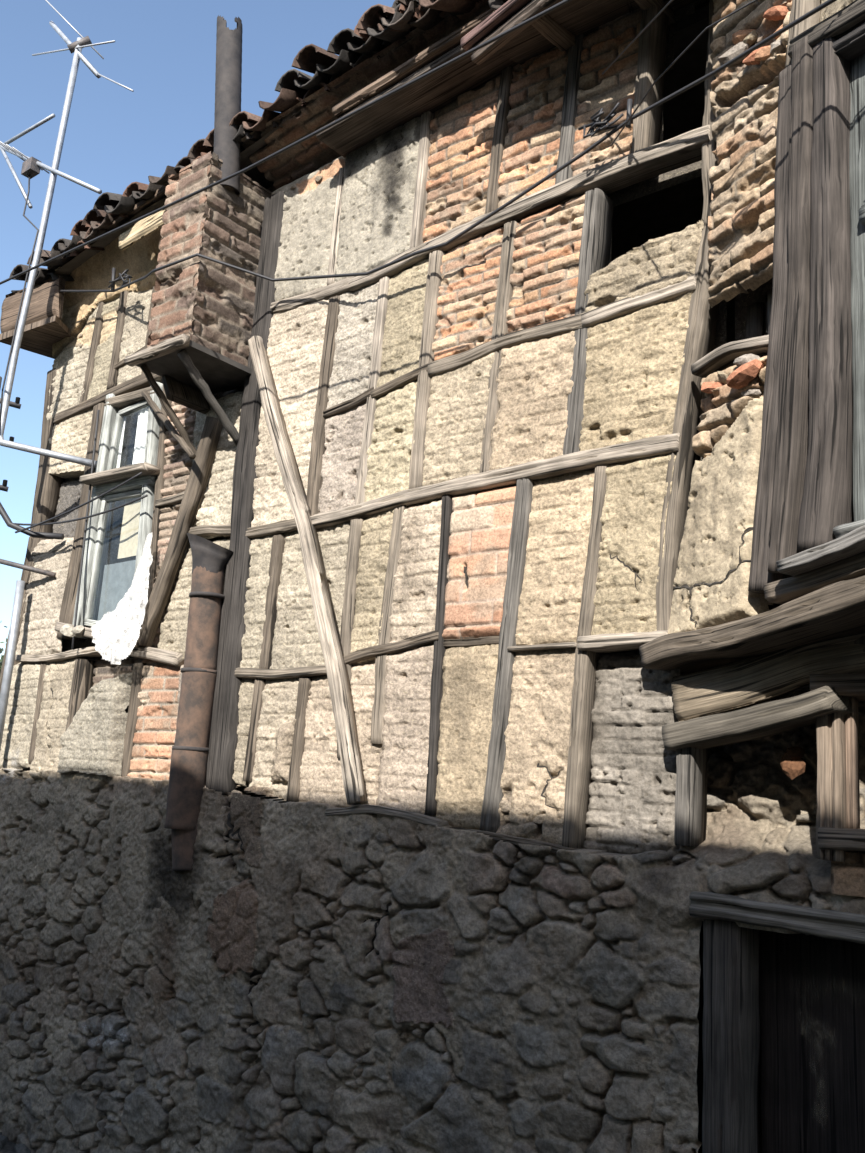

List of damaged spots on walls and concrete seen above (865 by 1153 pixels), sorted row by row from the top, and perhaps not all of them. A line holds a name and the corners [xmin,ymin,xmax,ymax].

spalling [718,1,791,72]
spalling [692,354,767,458]
crack [610,554,643,590]
crack [673,527,753,626]